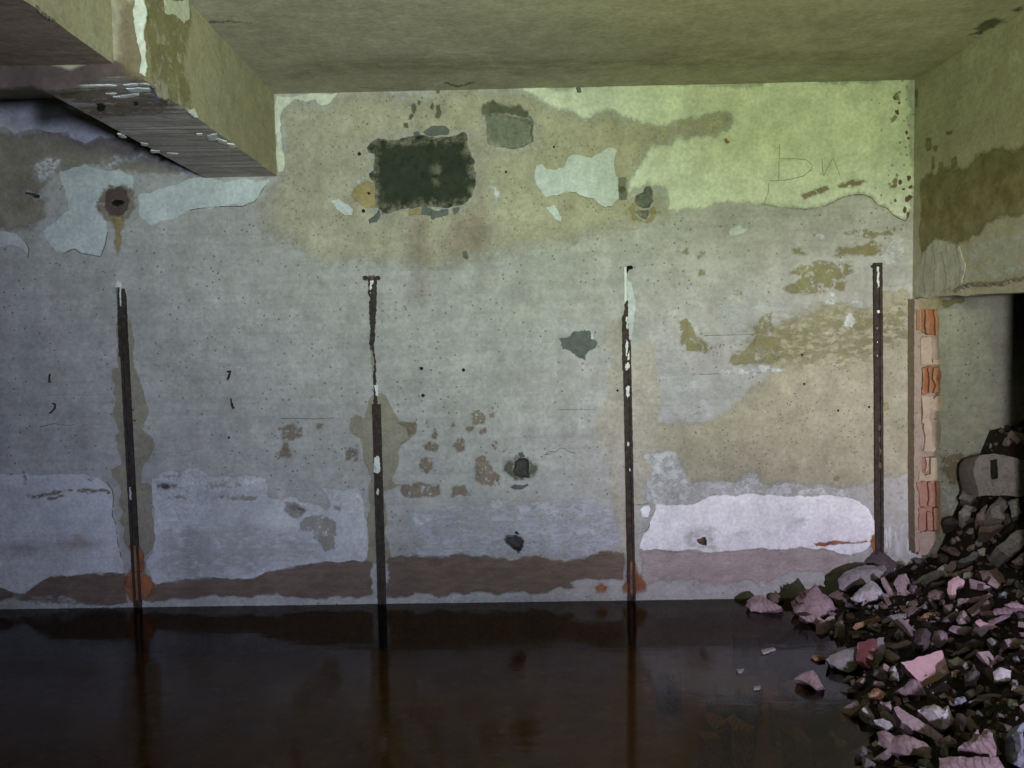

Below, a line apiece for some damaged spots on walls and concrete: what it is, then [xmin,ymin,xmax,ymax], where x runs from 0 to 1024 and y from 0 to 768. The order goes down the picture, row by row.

leakage [428,164,442,186]
flaking render [35,80,914,265]
corrosion [105,187,129,252]
corrosion [368,279,378,408]
flaking render [411,239,966,559]
corrosion [124,545,154,602]
leakage [0,561,373,631]
leakage [386,551,626,609]
corrosion [623,561,646,594]
leakage [637,548,849,606]